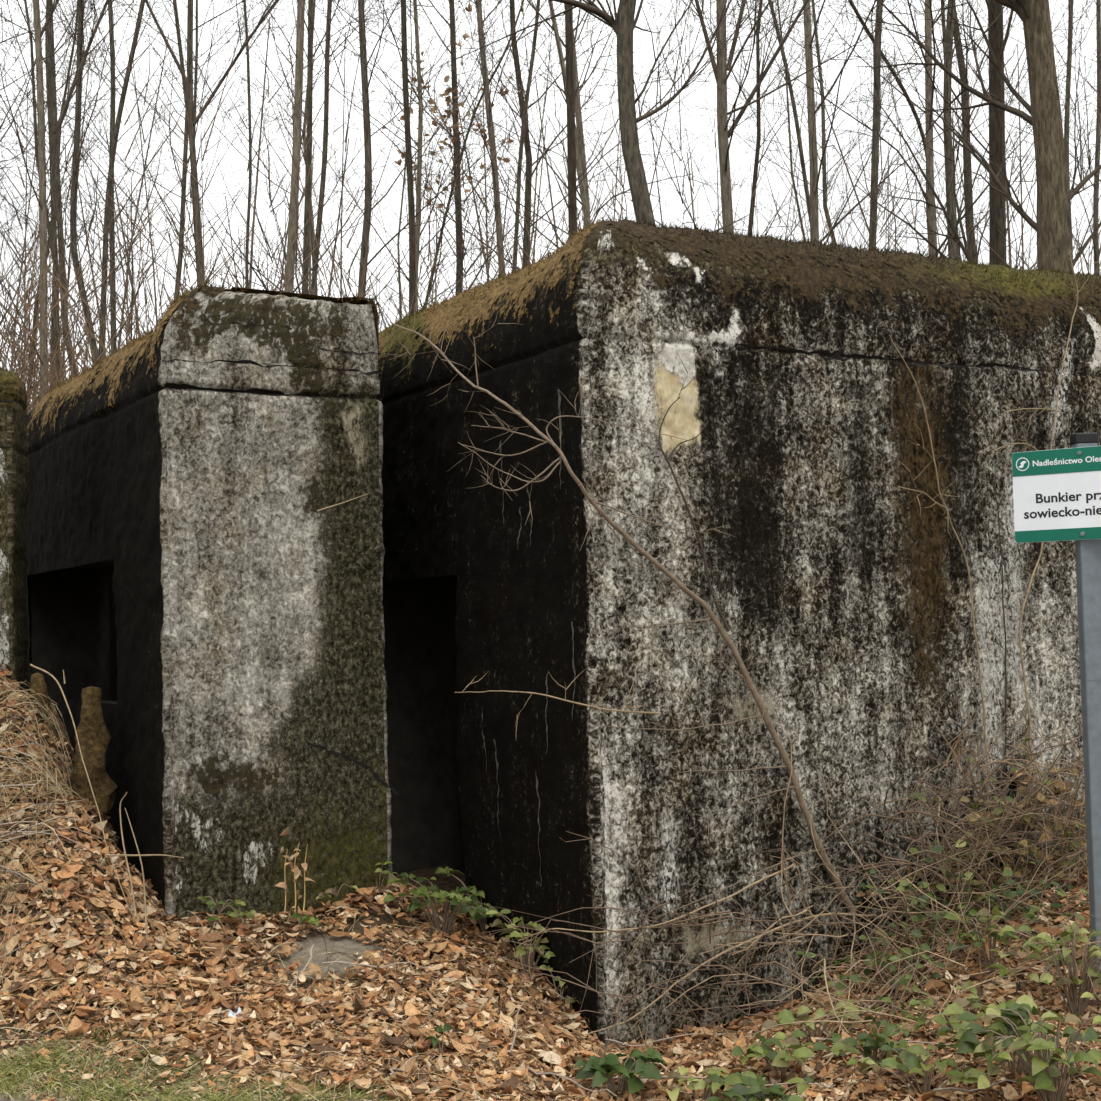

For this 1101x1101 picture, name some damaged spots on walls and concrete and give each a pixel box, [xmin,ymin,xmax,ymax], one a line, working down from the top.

crack [212,321,292,330]
crack [163,347,383,400]
peeling [653,308,742,453]
crack [712,343,1101,383]
damp [1050,344,1073,436]
damp [697,365,780,627]
damp [842,372,882,616]
damp [945,368,1042,777]
damp [174,375,388,924]